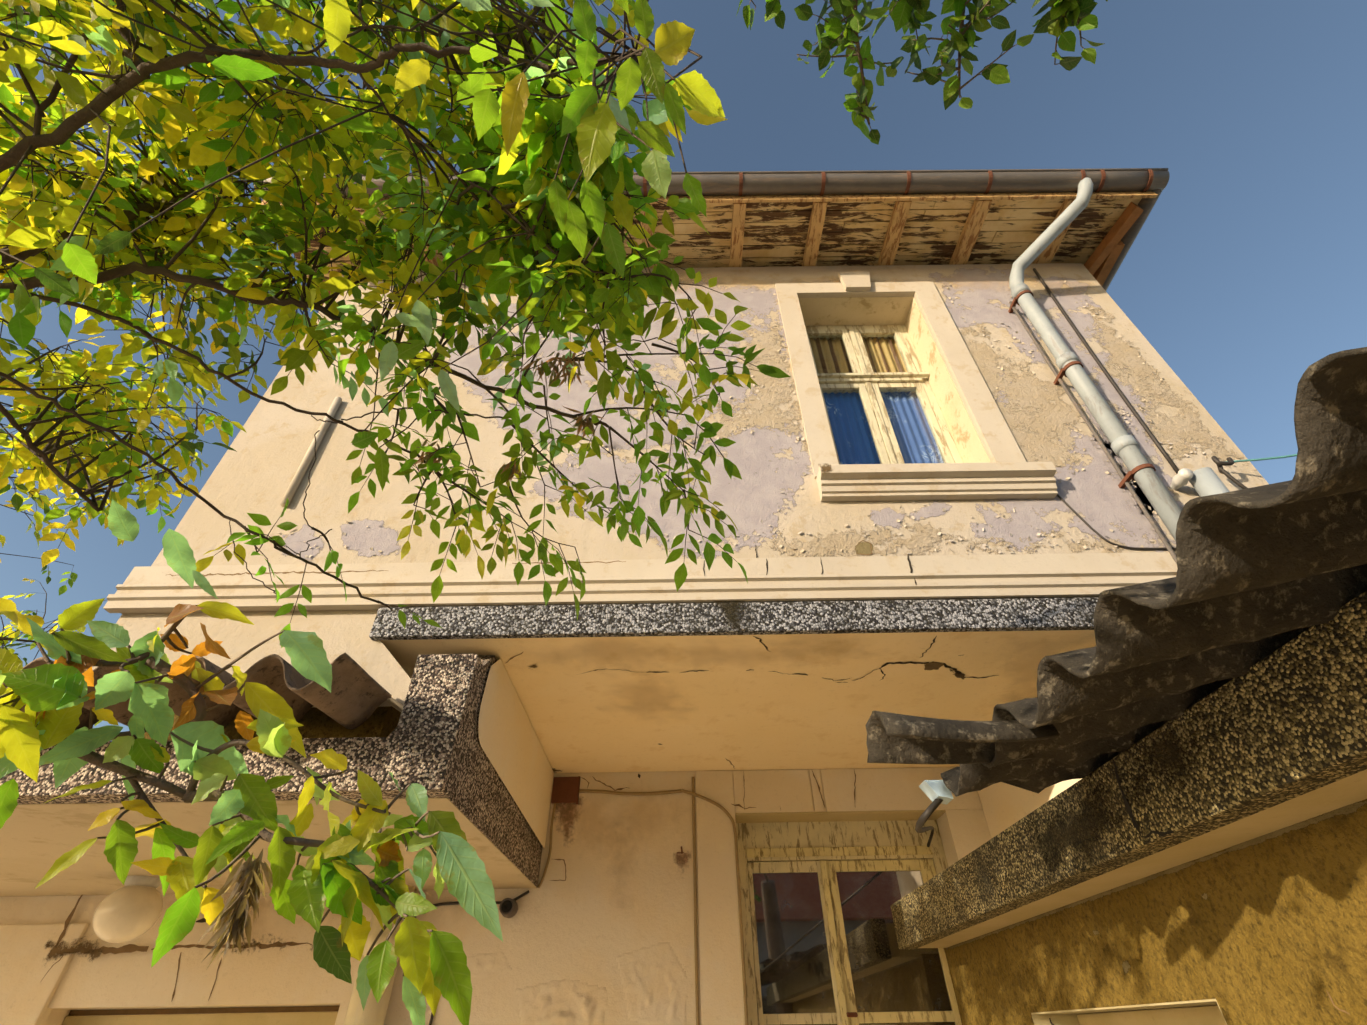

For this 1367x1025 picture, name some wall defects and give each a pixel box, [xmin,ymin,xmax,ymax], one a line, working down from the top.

peeling [447,266,1249,559]
peeling [277,524,324,563]
peeling [341,519,400,558]
crack [746,636,998,683]
crack [41,895,313,1002]